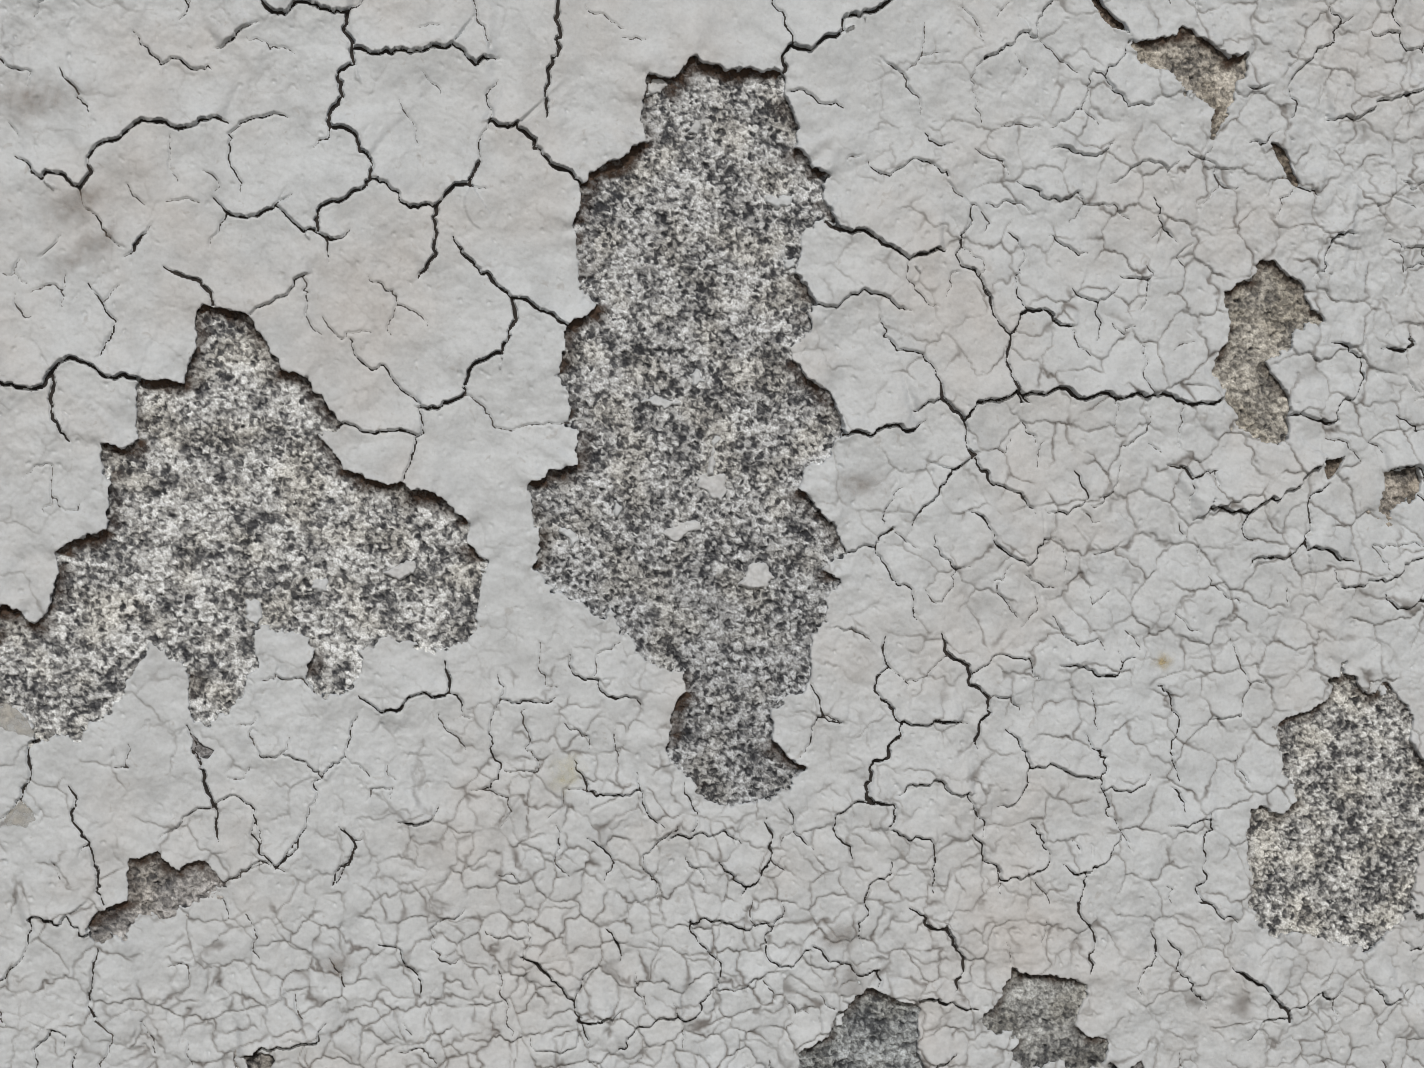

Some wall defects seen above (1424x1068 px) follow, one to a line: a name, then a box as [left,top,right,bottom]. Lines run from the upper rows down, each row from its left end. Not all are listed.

peeling [0,310,488,768]
crack [0,0,646,511]
peeling [527,69,846,807]
crack [817,0,1424,620]
peeling [1212,261,1323,445]
crack [3,738,41,818]
crack [0,786,193,1068]
crack [168,512,1238,1067]
peeling [798,981,923,1068]
peeling [982,967,1143,1068]
crack [1232,967,1409,1041]
peeling [1246,661,1424,952]